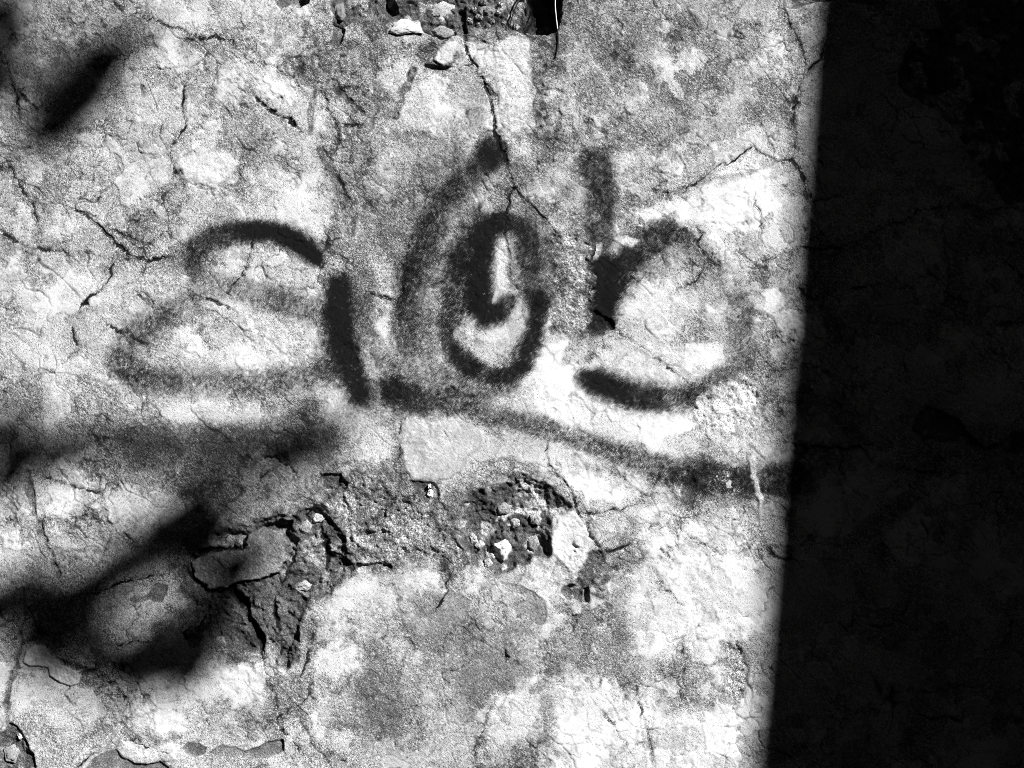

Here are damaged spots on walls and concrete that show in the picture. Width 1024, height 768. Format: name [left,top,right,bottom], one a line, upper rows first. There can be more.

crack [0,145,66,253]
crack [169,81,187,182]
crack [253,94,301,132]
crack [270,64,362,247]
crack [464,39,549,257]
crack [683,15,826,208]
crack [72,211,168,347]
crack [198,237,254,309]
spalling [130,417,649,670]